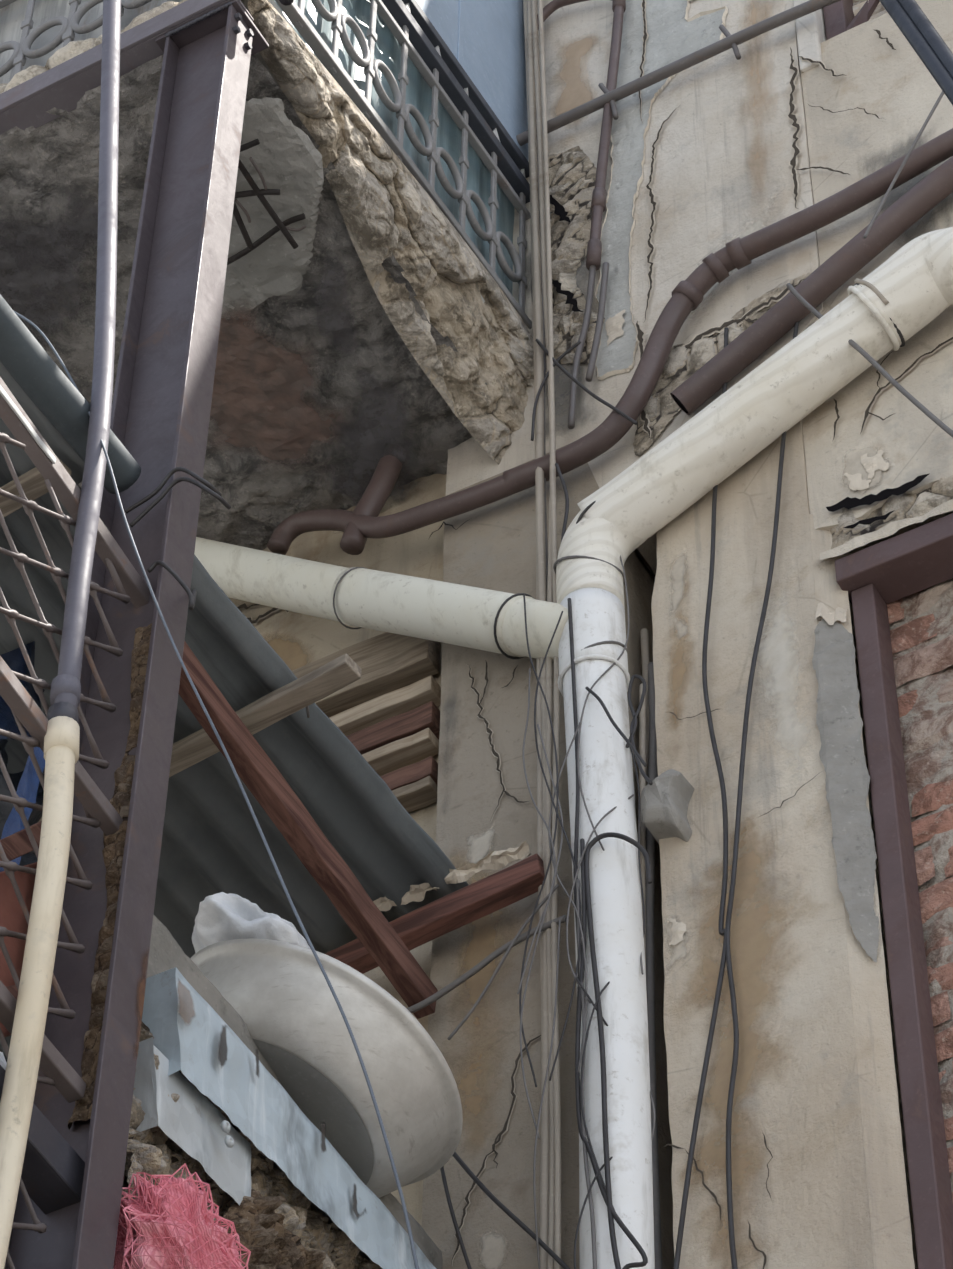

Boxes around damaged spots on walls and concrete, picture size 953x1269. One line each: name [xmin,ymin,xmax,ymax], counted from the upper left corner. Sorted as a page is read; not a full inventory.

spalling [227,138,306,265]